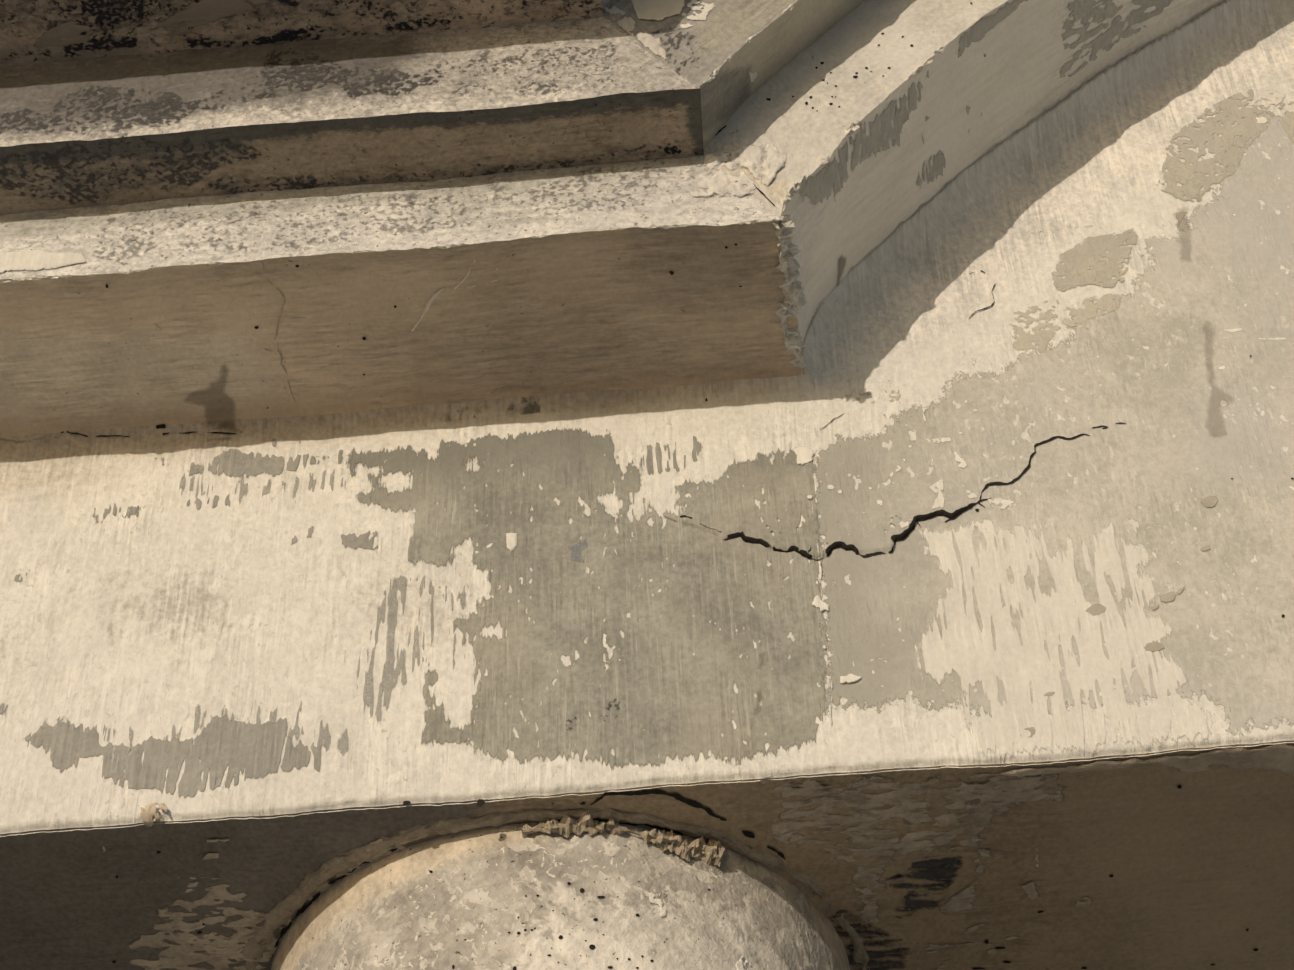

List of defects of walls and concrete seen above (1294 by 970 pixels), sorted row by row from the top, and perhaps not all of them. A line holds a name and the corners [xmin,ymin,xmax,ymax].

spalling [699,0,799,87]
peeling [1060,0,1173,78]
peeling [772,0,1028,369]
peeling [186,89,1294,770]
crack [665,422,1125,561]
peeling [25,714,326,827]